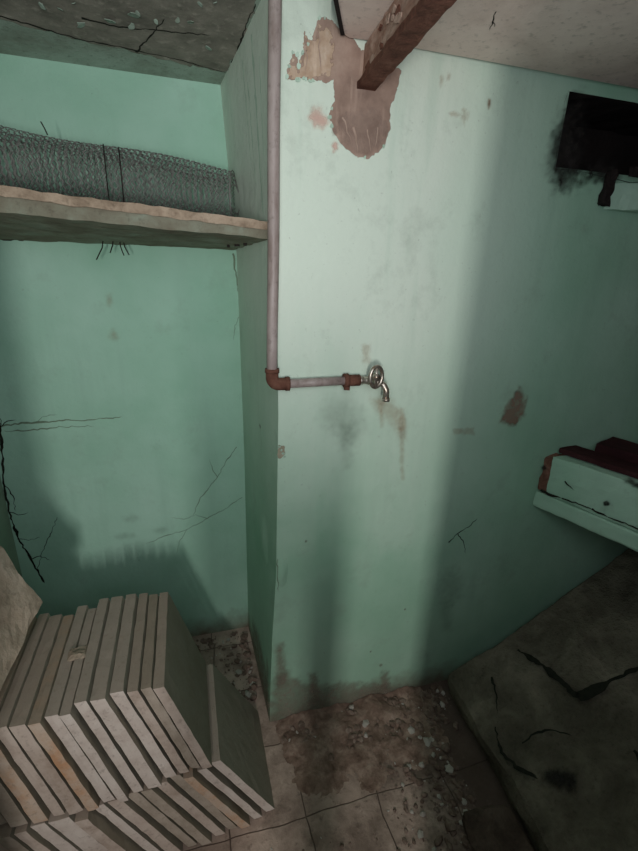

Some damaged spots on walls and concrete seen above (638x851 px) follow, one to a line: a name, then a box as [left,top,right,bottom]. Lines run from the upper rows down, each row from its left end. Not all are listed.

peeling [285,16,401,159]
peeling [502,391,523,425]
crack [0,415,120,583]
crack [146,447,241,551]
crack [517,649,638,701]
crack [491,677,576,791]